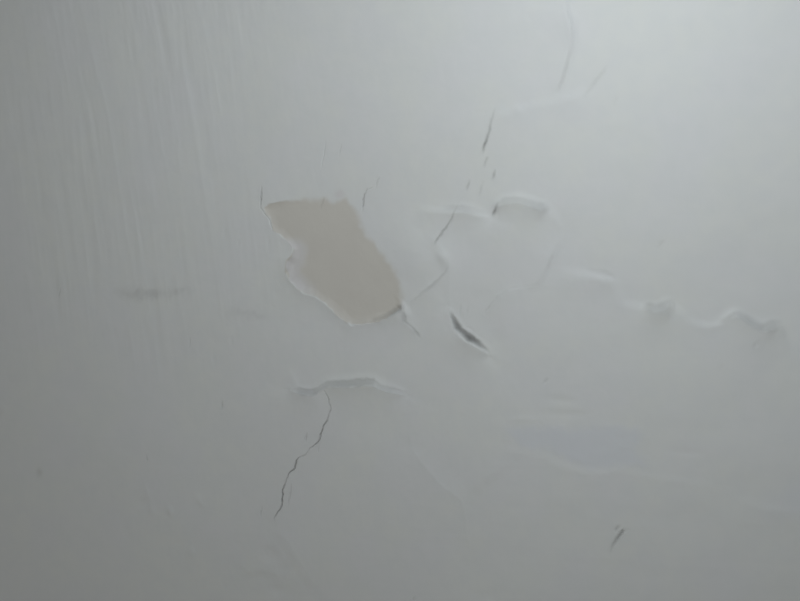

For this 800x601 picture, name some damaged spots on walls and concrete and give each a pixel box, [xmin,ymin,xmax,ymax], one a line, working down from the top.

peeling [257,181,409,333]
crack [270,387,334,526]